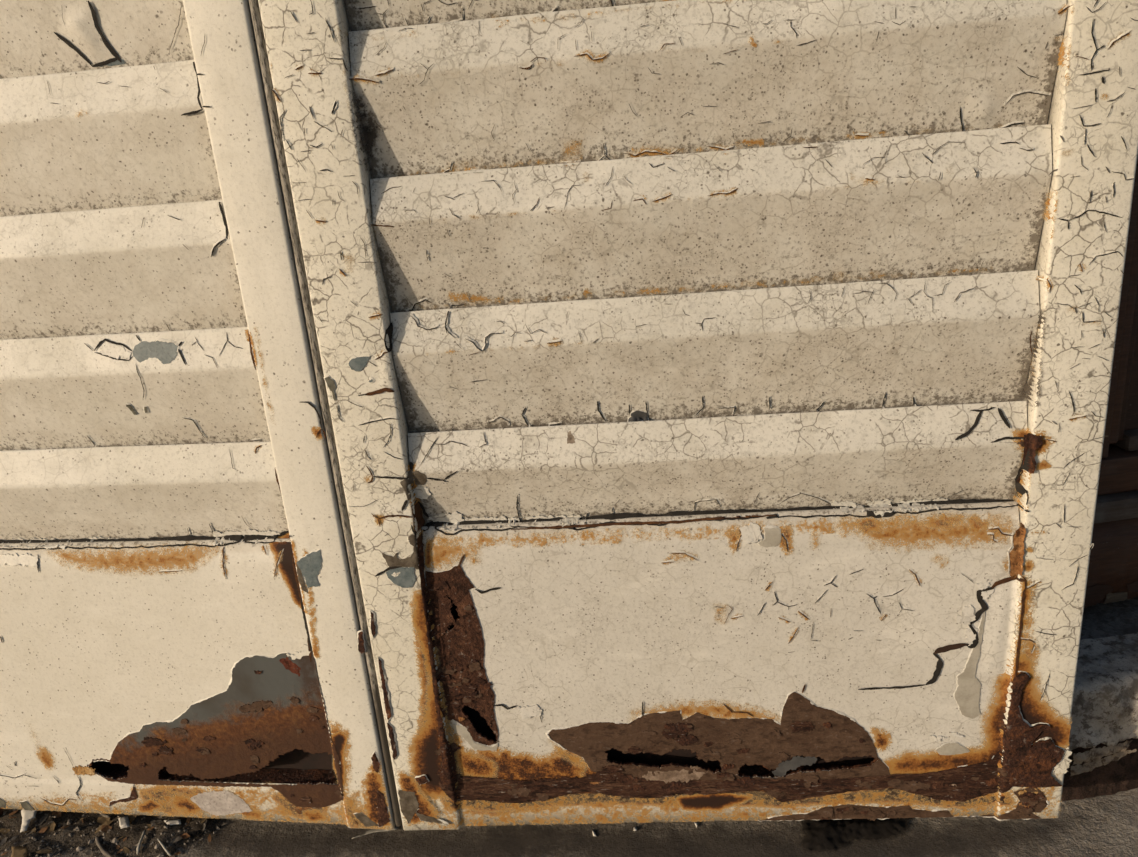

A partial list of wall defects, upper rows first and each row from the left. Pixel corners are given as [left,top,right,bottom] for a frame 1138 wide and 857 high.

crack [272,0,678,389]
crack [855,106,979,182]
crack [955,0,1138,528]
peeling [84,335,186,415]
peeling [296,549,323,593]
corrosion [400,464,741,568]
crack [300,399,1094,701]
corrosion [779,513,1013,567]
corrosion [1012,428,1053,510]
peeling [72,644,343,808]
corrosion [0,532,1072,830]
peeling [545,684,892,787]